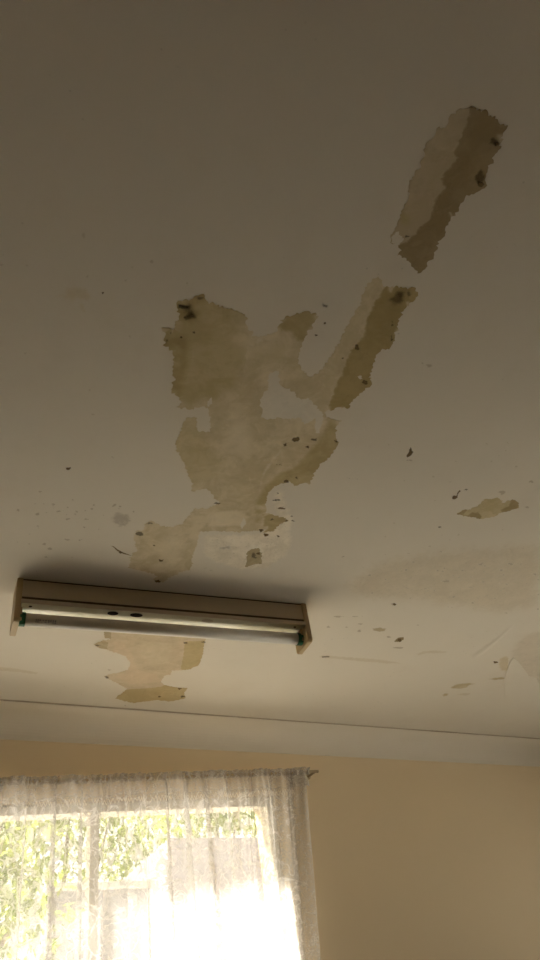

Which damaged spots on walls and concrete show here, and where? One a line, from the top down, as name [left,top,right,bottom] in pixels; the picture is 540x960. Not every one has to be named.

peeling [390,106,508,274]
peeling [128,277,418,583]
peeling [457,490,529,519]
peeling [94,632,206,706]